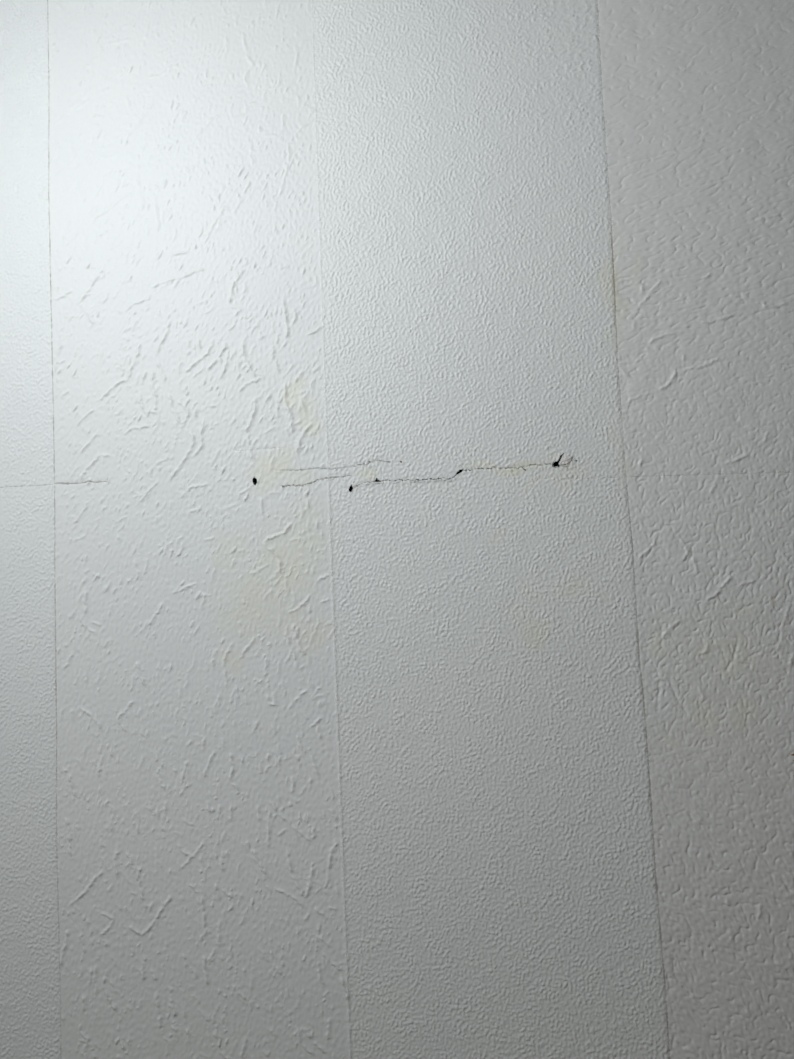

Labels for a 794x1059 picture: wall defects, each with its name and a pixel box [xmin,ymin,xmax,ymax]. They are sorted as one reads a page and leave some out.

crack [349,453,578,492]